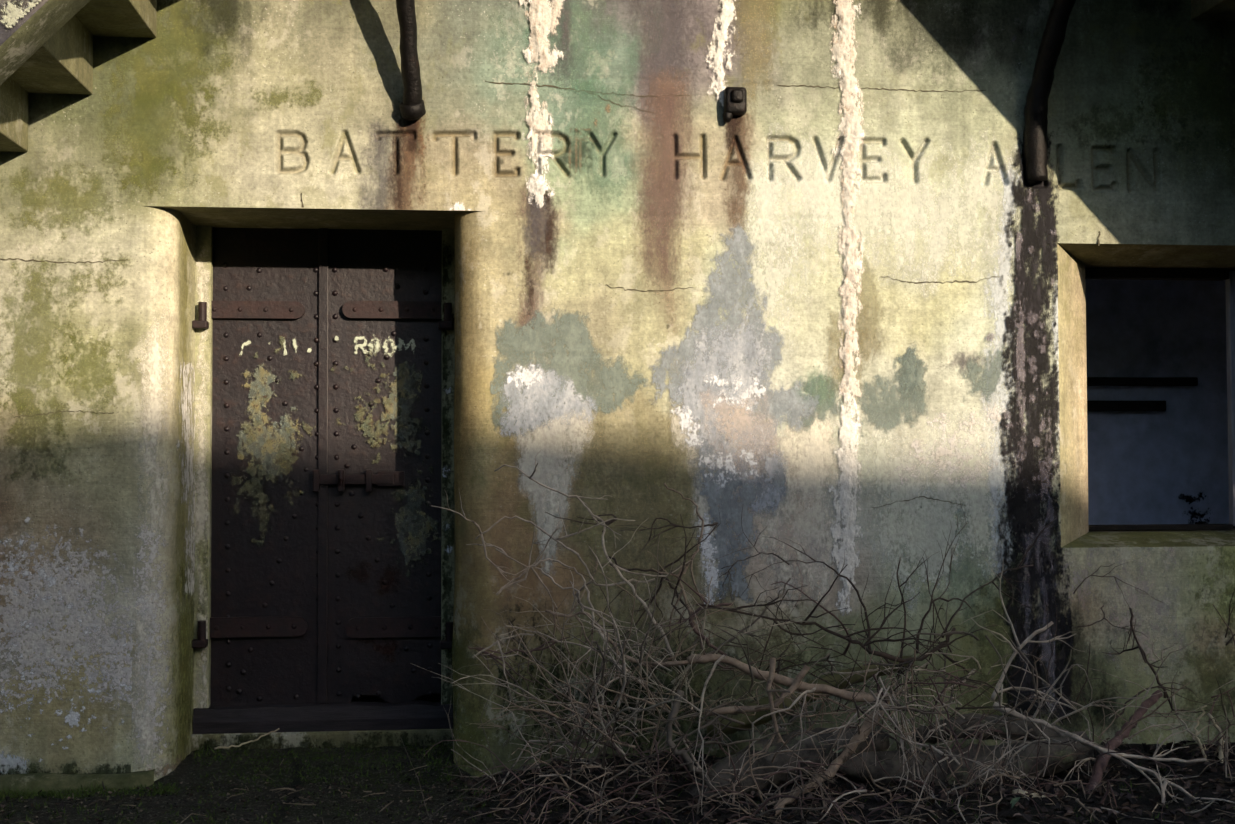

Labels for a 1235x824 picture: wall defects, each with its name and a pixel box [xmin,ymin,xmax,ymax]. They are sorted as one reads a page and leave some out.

water stain [519,0,570,207]
peeling [231,352,313,547]
peeling [337,347,452,577]
rust [519,194,557,329]
water stain [745,0,1103,721]